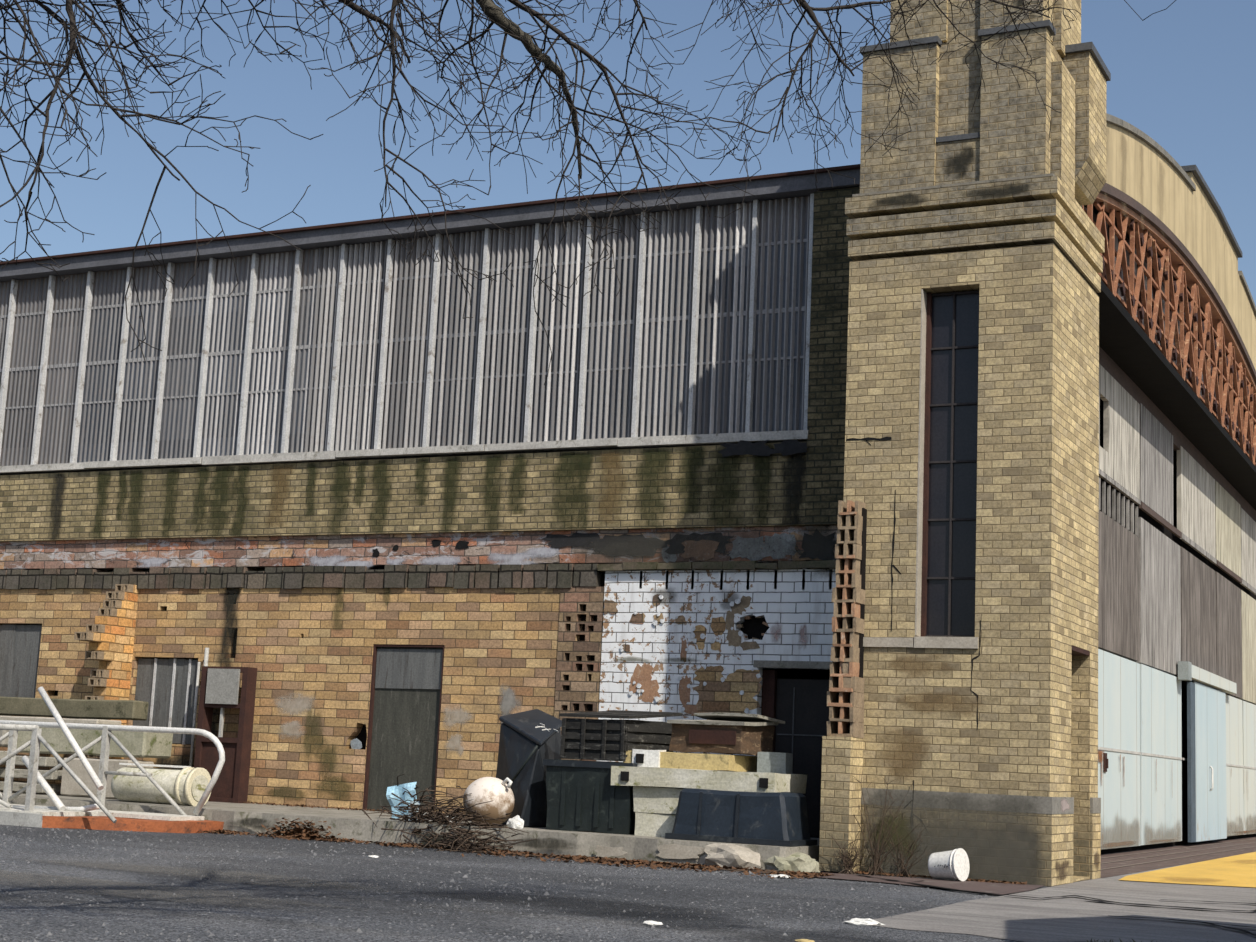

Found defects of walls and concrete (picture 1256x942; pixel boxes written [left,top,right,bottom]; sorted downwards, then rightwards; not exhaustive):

damp [51,474,66,540]
damp [93,471,143,539]
damp [195,467,249,536]
damp [305,463,317,516]
damp [333,460,390,534]
damp [443,457,459,532]
damp [485,455,526,528]
damp [638,447,740,527]
damp [754,445,806,525]
peeling [730,533,796,561]
peeling [603,594,769,720]
crack [971,620,981,730]